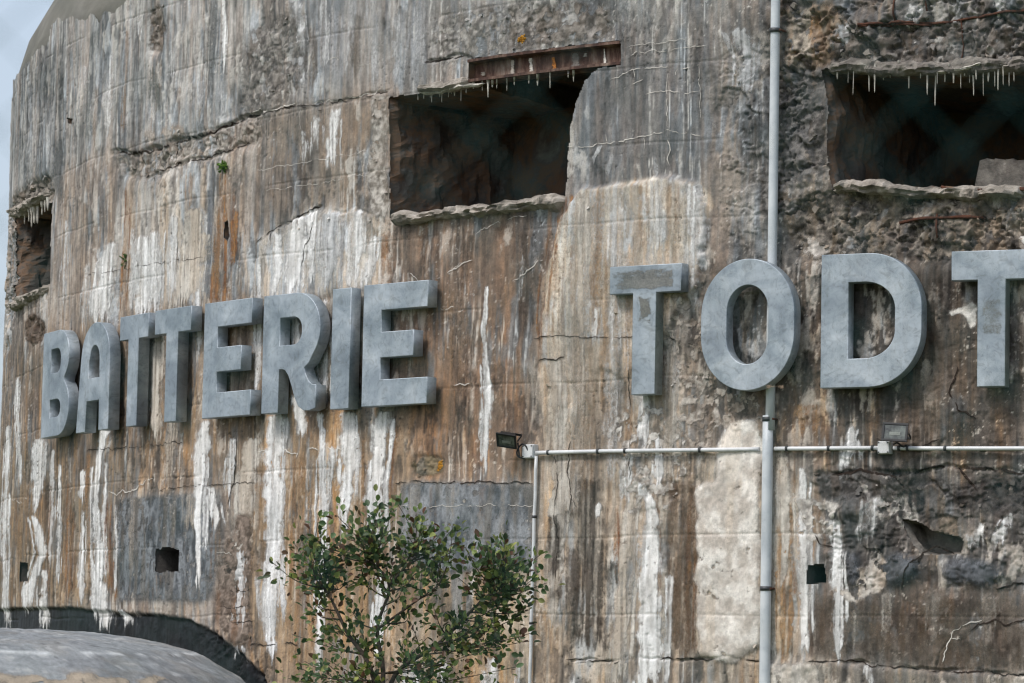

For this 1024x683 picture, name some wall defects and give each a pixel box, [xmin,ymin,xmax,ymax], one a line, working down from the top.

spalling [13,176,55,209]
spalling [117,16,305,178]
crack [255,150,364,266]
spalling [366,95,390,221]
crack [568,40,705,166]
spalling [778,2,1024,262]
water stain [547,159,709,683]
water stain [0,378,132,630]
water stain [146,324,395,671]
spalling [796,466,1024,602]
crack [808,582,1024,676]